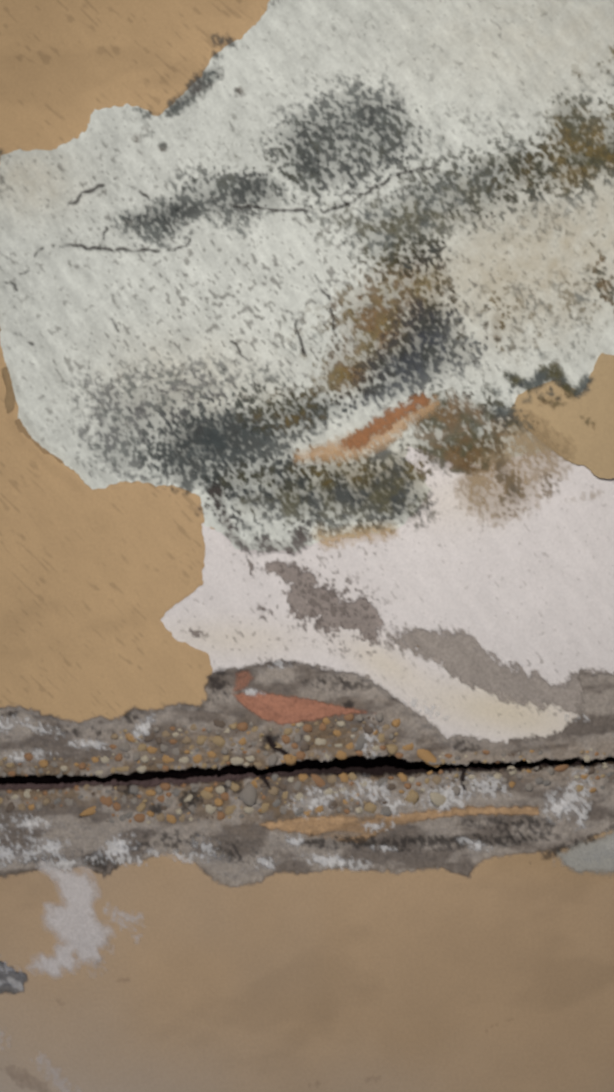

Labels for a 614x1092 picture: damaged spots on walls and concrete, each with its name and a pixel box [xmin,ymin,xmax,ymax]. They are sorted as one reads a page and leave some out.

mould [166,71,219,117]
damp [98,84,614,554]
peeling [0,0,614,778]
rust [297,394,437,459]
crack [0,735,614,791]
flaking render [0,762,614,887]
efflorescence [35,860,108,975]
flaking render [0,961,27,994]